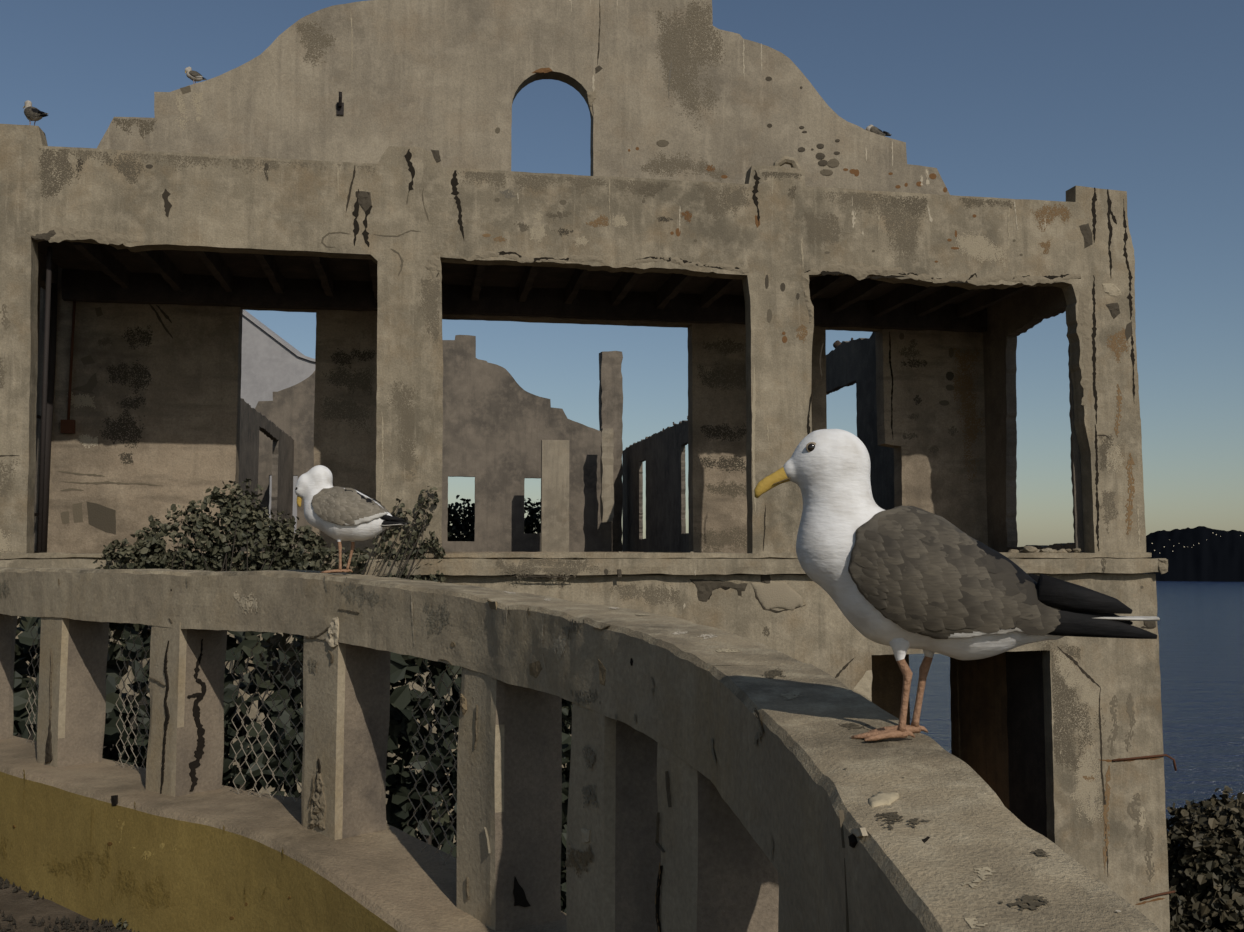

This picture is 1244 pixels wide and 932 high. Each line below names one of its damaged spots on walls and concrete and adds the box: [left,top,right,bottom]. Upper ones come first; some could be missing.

spalling [26,226,140,245]
crack [321,149,464,276]
crack [498,251,569,262]
crack [1012,187,1135,551]
crack [149,618,206,794]